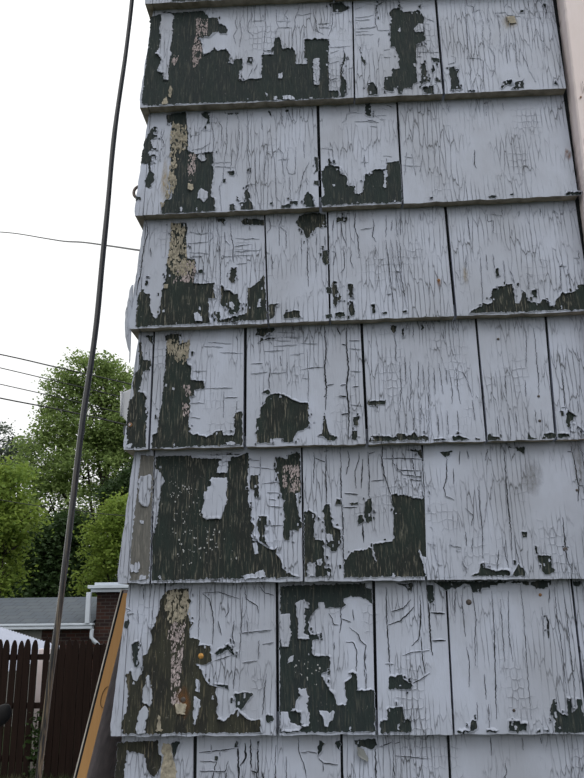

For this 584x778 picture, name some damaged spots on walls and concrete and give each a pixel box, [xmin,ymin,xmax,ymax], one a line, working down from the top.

crack [417,0,563,116]
peeling [468,267,584,315]
peeling [114,0,556,778]
peeling [457,696,584,734]